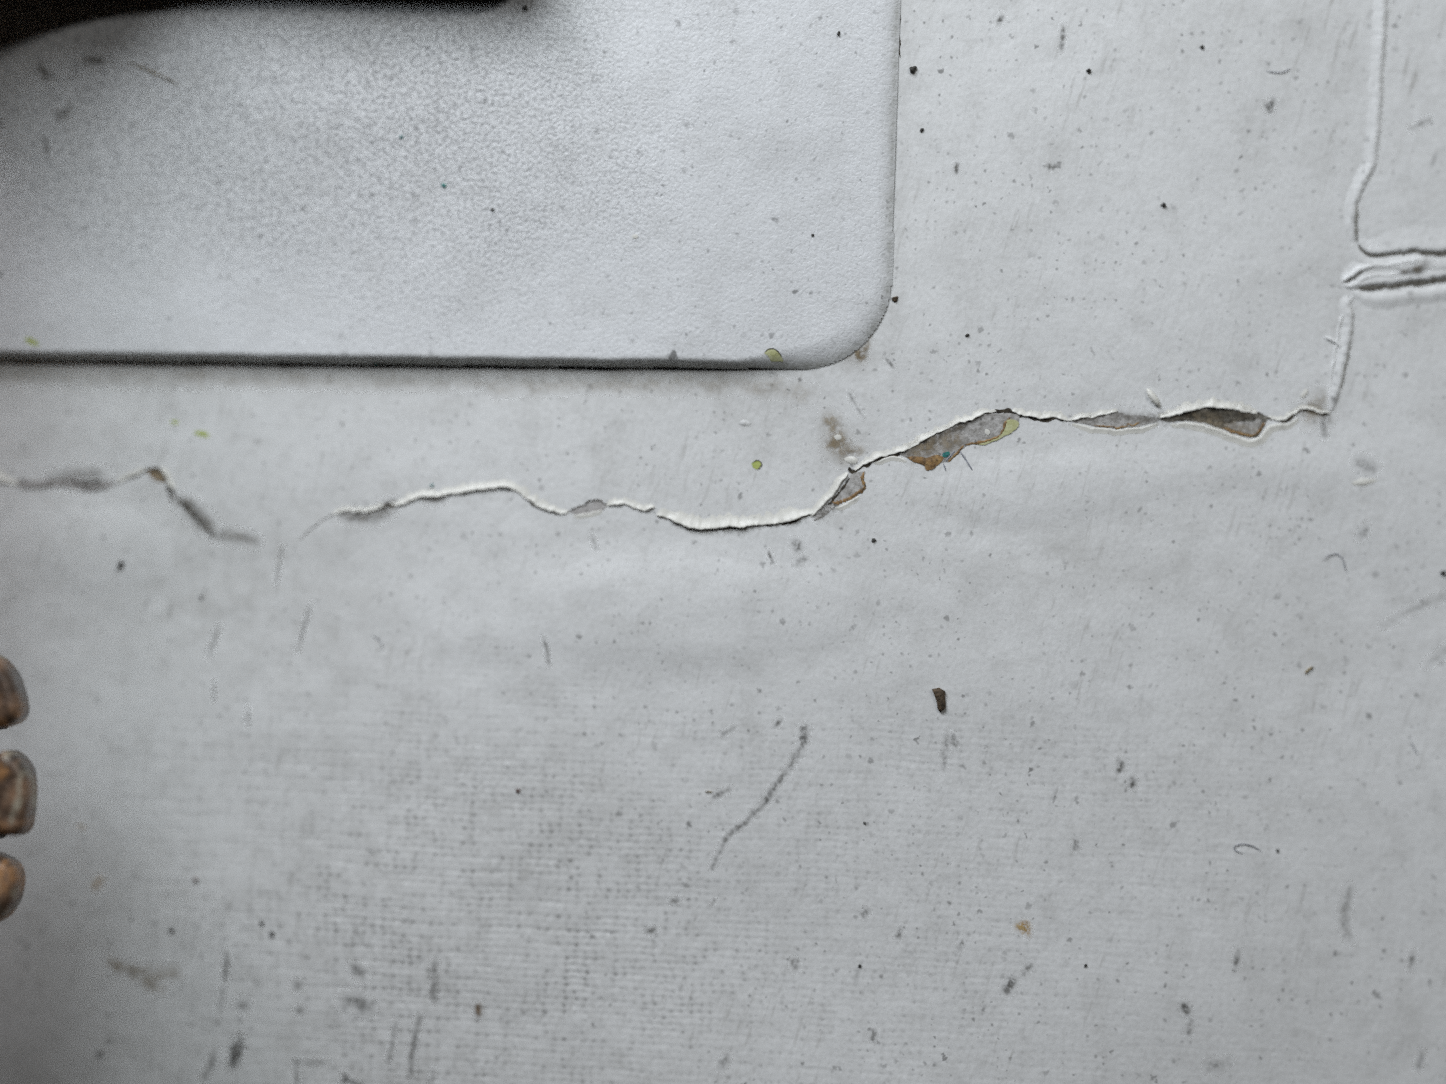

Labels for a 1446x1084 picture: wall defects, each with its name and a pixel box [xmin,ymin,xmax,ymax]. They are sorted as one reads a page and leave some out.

peeling [810,413,1019,520]
crack [848,408,1118,474]
peeling [1072,388,1299,448]
crack [1158,396,1330,430]
crack [116,467,241,538]
crack [301,479,569,539]
crack [606,497,814,531]